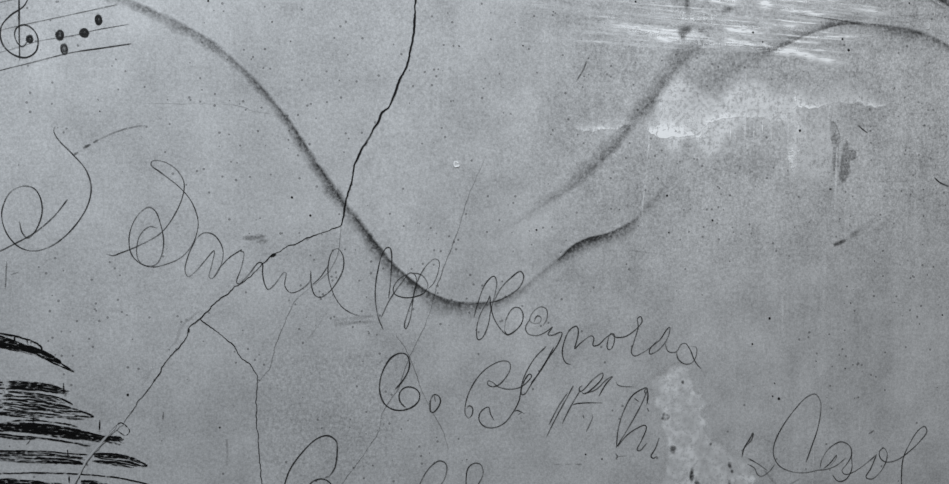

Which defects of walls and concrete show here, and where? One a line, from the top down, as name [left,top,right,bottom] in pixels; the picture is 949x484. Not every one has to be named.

crack [72,0,417,484]